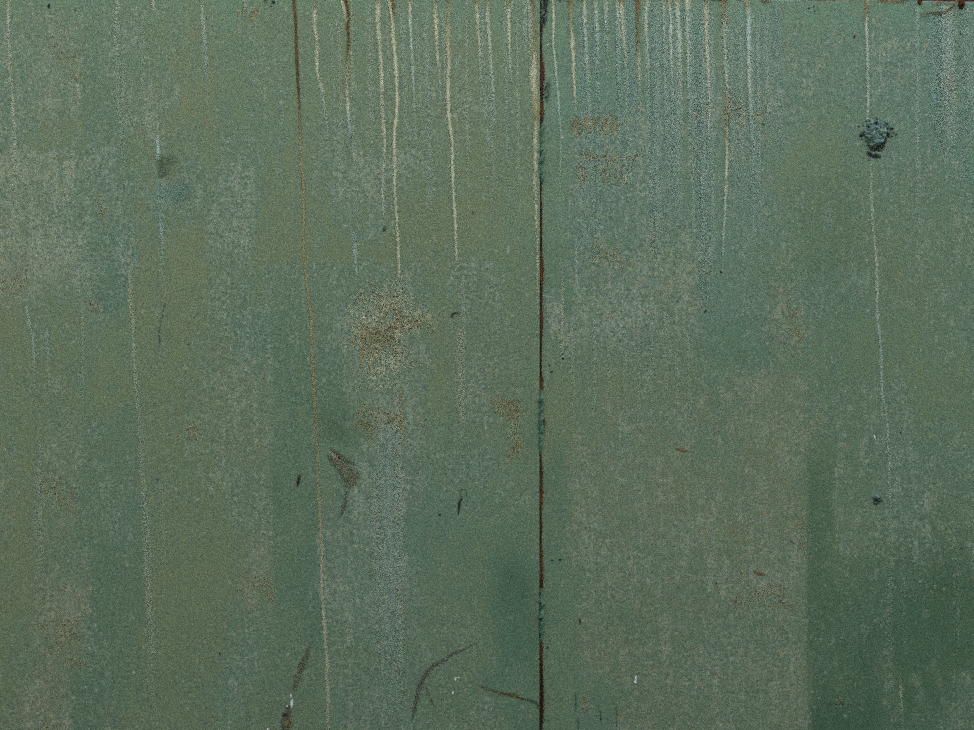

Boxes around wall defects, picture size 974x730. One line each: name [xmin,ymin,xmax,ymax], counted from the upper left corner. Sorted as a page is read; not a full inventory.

water stain [341,0,351,134]
water stain [345,0,428,388]
water stain [426,0,458,258]
water stain [568,0,729,251]
water stain [744,0,759,151]
rust [351,283,435,367]
water stain [870,162,891,494]